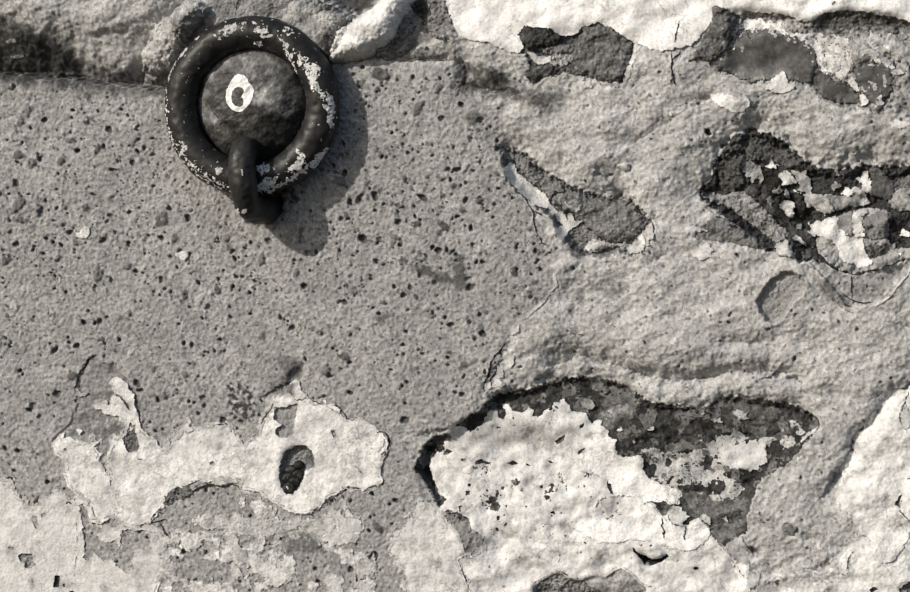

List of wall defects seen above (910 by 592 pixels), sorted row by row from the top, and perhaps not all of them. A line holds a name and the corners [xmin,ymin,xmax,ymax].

spalling [376,0,910,113]
spalling [500,146,655,258]
spalling [683,127,910,306]
crack [483,338,514,391]
peeling [0,355,391,592]
peeling [387,376,910,592]